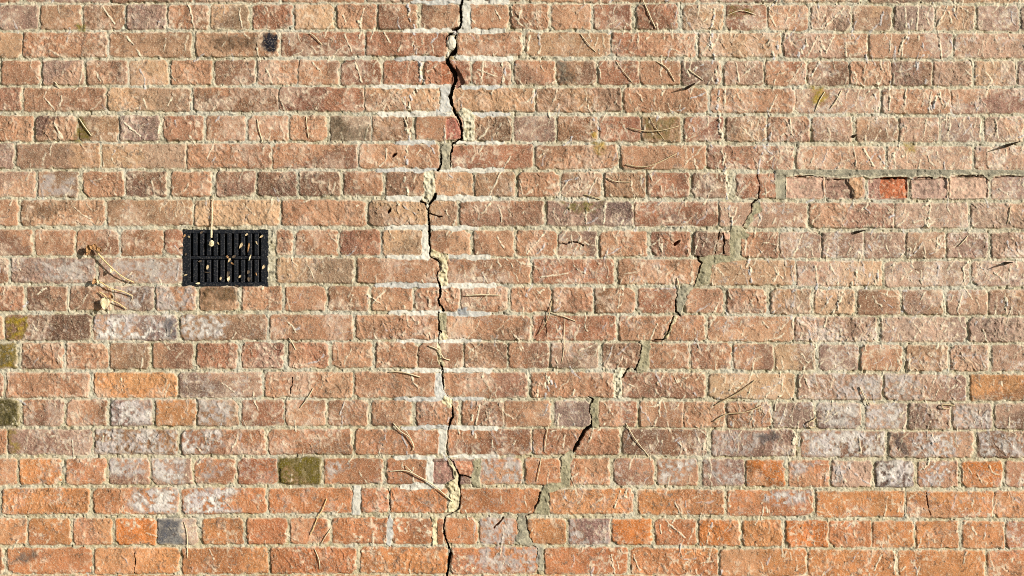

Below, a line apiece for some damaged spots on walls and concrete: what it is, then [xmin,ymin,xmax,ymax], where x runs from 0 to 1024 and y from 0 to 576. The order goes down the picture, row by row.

crack [788,174,848,182]
crack [880,173,1024,181]
crack [559,240,584,248]
crack [419,0,472,576]
crack [621,174,761,379]
crack [573,396,594,453]
crack [493,491,542,561]